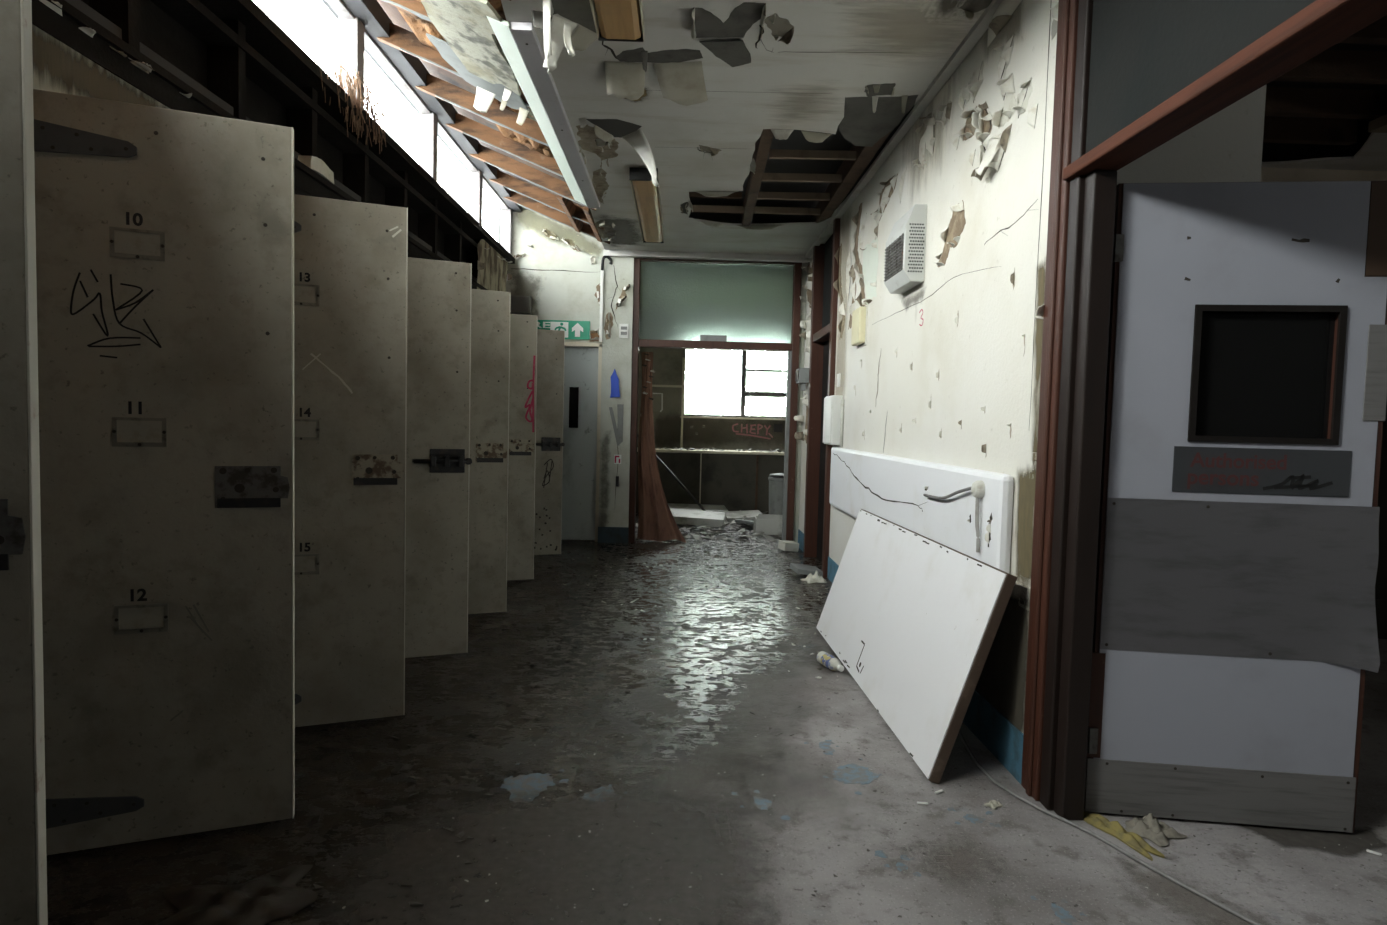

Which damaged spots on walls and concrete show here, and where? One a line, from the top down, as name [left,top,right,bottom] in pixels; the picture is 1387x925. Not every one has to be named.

peeling [532,0,598,73]
peeling [605,2,794,106]
peeling [576,118,659,241]
peeling [699,145,721,156]
peeling [833,33,1038,340]
crack [872,7,1051,450]
peeling [589,284,630,340]